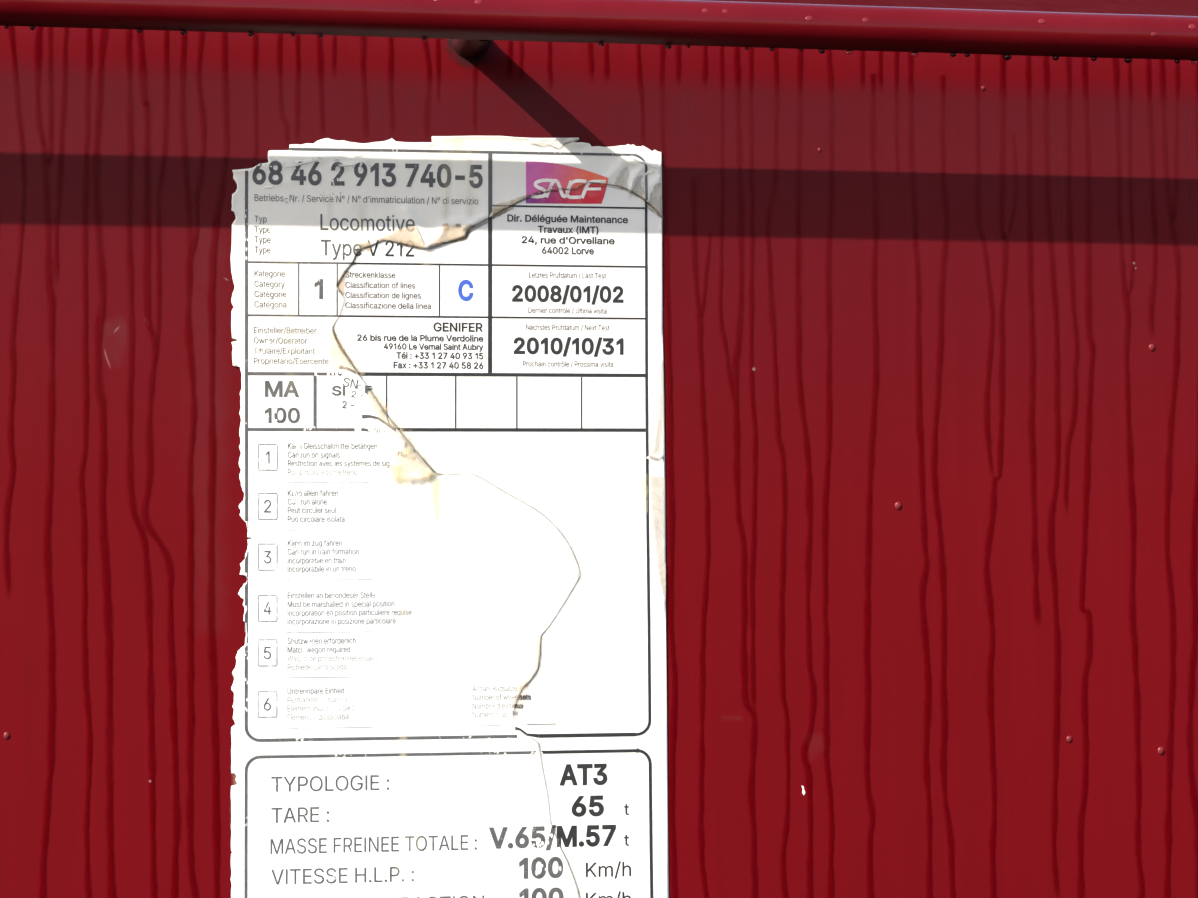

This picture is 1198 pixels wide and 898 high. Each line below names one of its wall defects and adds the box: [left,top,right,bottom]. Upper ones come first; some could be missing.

damp [40,122,63,898]
damp [79,146,115,898]
damp [127,153,223,898]
damp [651,295,677,898]
damp [697,269,757,898]
damp [770,265,834,898]
damp [864,253,878,898]
damp [916,285,955,898]
damp [984,278,1005,898]
damp [1029,262,1095,898]
damp [1123,278,1144,898]
damp [1165,271,1198,898]